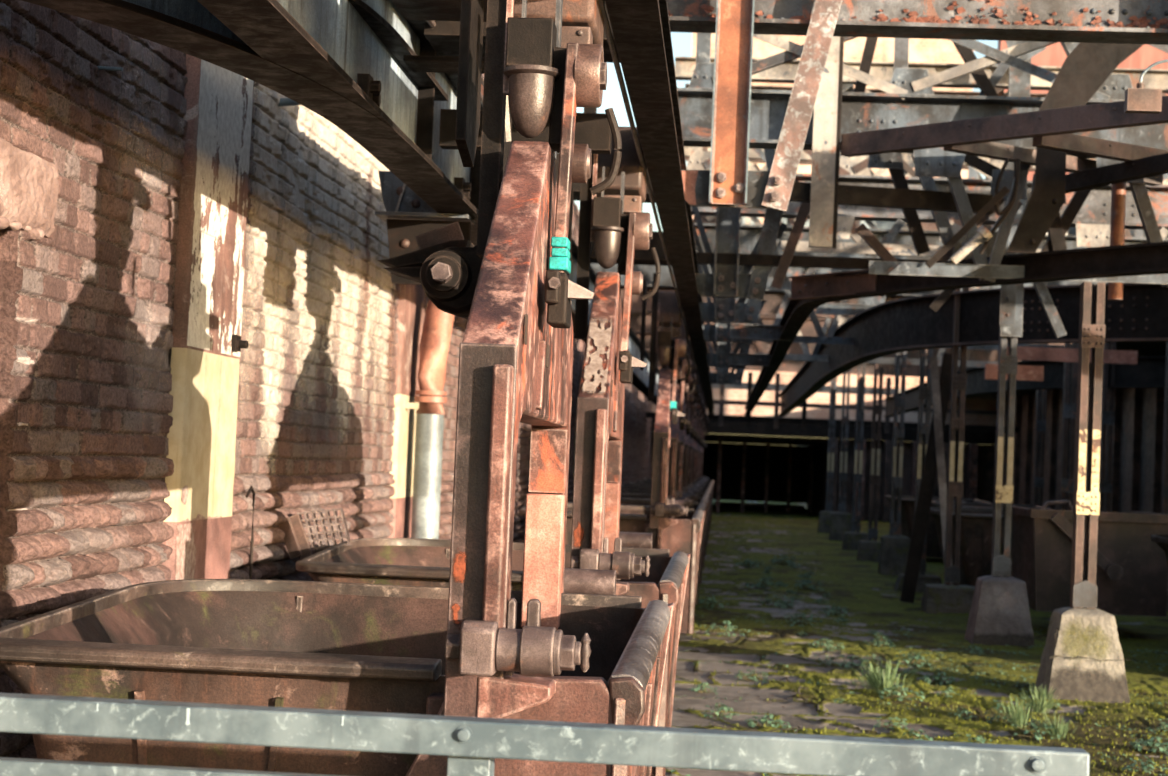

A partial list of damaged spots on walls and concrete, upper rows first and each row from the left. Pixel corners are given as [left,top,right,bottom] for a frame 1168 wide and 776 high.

rust [852,0,1168,29]
peeling [187,59,253,357]